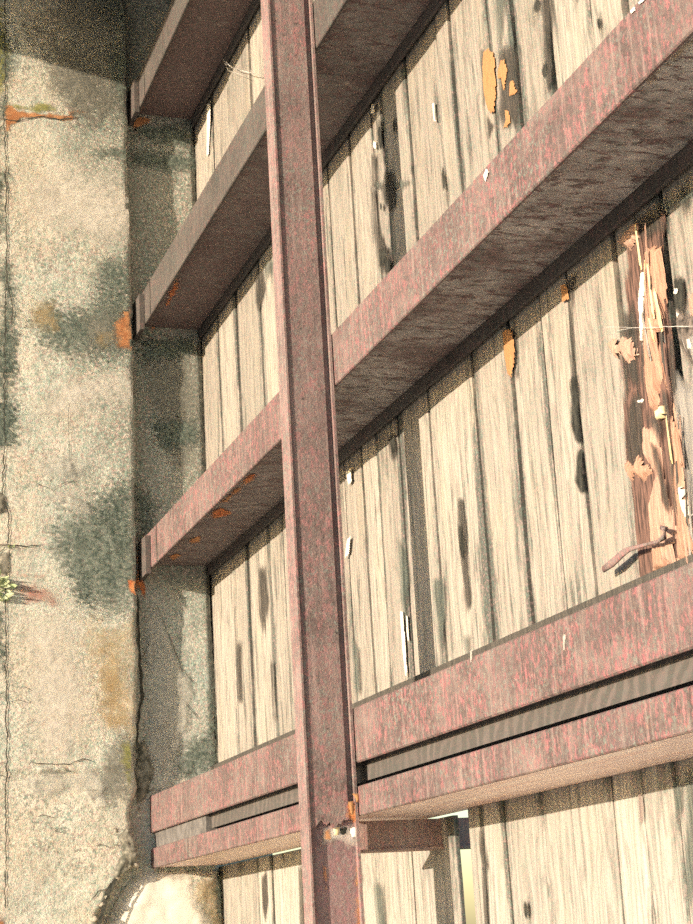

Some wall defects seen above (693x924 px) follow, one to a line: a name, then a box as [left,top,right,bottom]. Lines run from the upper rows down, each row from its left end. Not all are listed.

water stain [0,28,14,117]
corrosion [4,105,84,130]
water stain [23,0,197,173]
peeling [481,47,519,137]
corrosion [116,312,132,347]
peeling [502,329,516,377]
water stain [44,476,160,620]